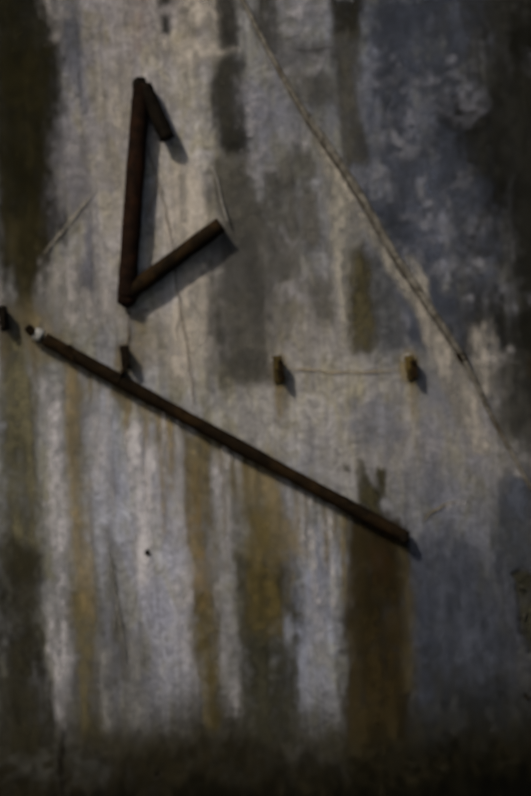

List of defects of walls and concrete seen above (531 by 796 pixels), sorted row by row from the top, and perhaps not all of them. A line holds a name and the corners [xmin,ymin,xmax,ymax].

damp [0,0,85,326]
damp [56,223,107,324]
damp [164,0,319,384]
damp [281,0,531,453]
damp [128,427,156,577]
rust [184,435,300,747]
damp [0,540,531,796]
rust [324,504,410,792]